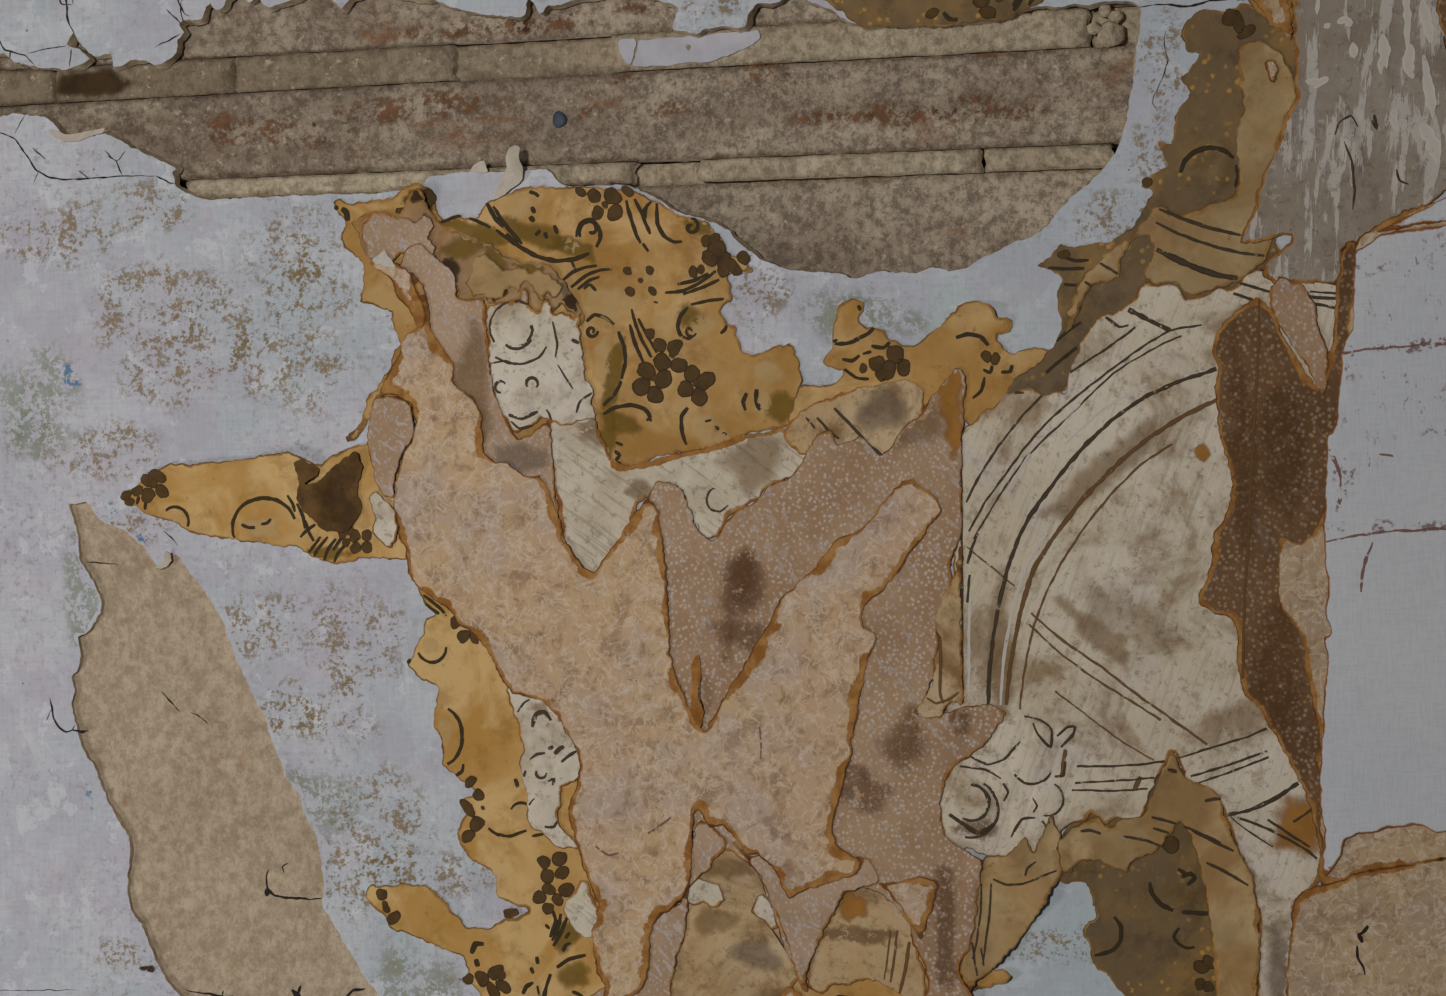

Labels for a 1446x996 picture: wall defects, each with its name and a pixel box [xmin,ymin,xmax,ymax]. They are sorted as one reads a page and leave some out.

crack [0,0,75,65]
crack [156,0,188,47]
peeling [618,39,637,64]
peeling [48,128,105,142]
crack [0,117,173,184]
peeling [471,145,523,200]
flaking render [72,503,377,996]
peeling [503,908,519,918]
peeling [959,815,1062,991]
crack [187,988,224,996]
crack [291,985,301,996]
crack [346,988,365,996]